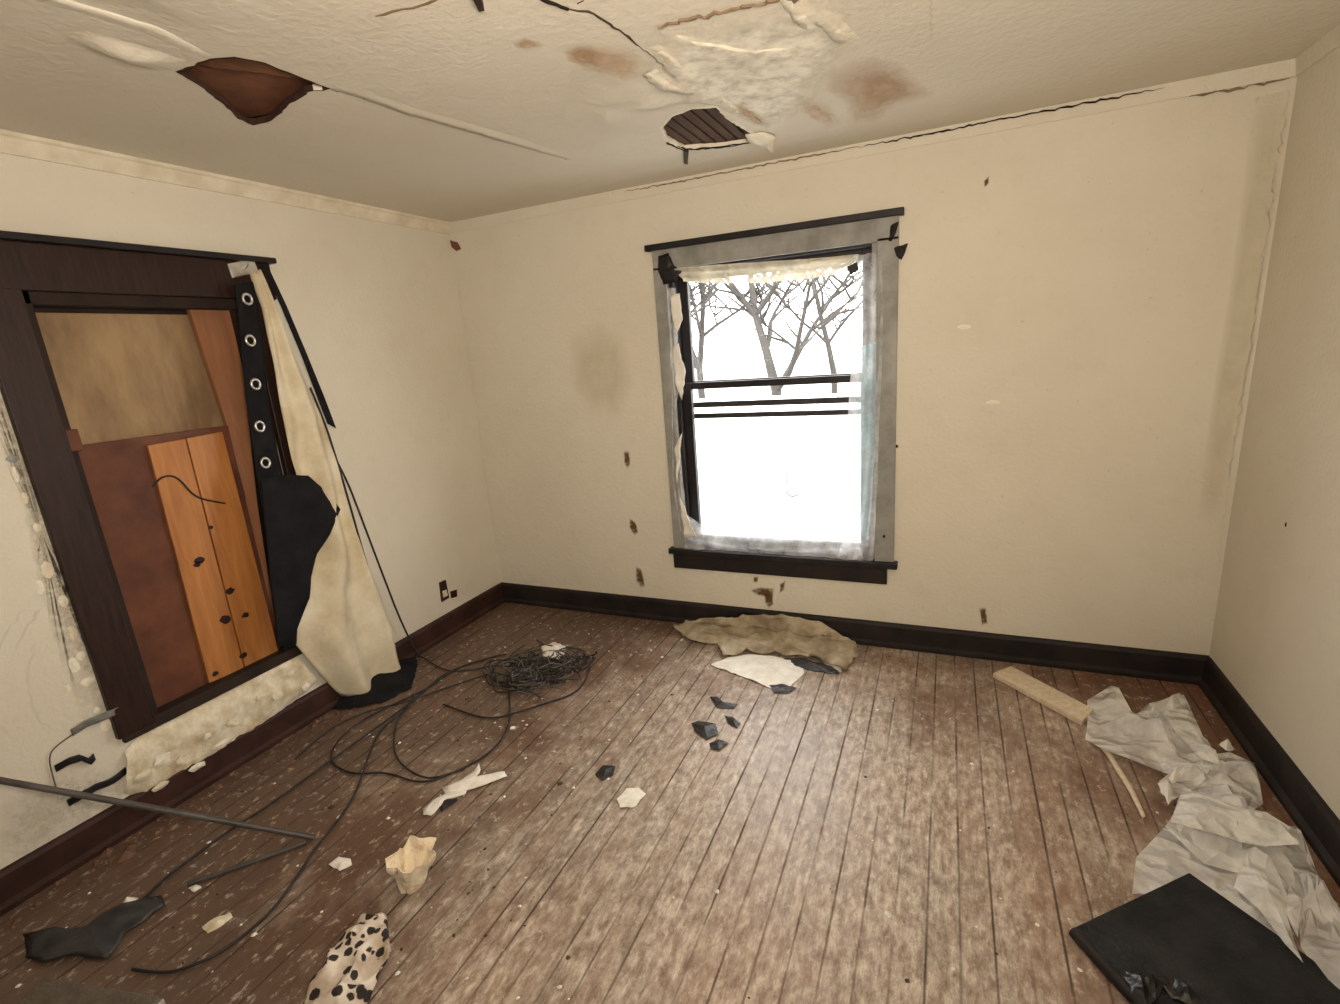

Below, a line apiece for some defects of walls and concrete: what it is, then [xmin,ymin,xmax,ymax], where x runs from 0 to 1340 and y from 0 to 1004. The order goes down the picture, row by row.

spalling [175,57,330,125]
peeling [375,0,437,17]
crack [540,0,676,79]
spalling [643,0,859,150]
peeling [2,401,94,693]
peeling [94,707,111,731]
spalling [123,657,317,795]